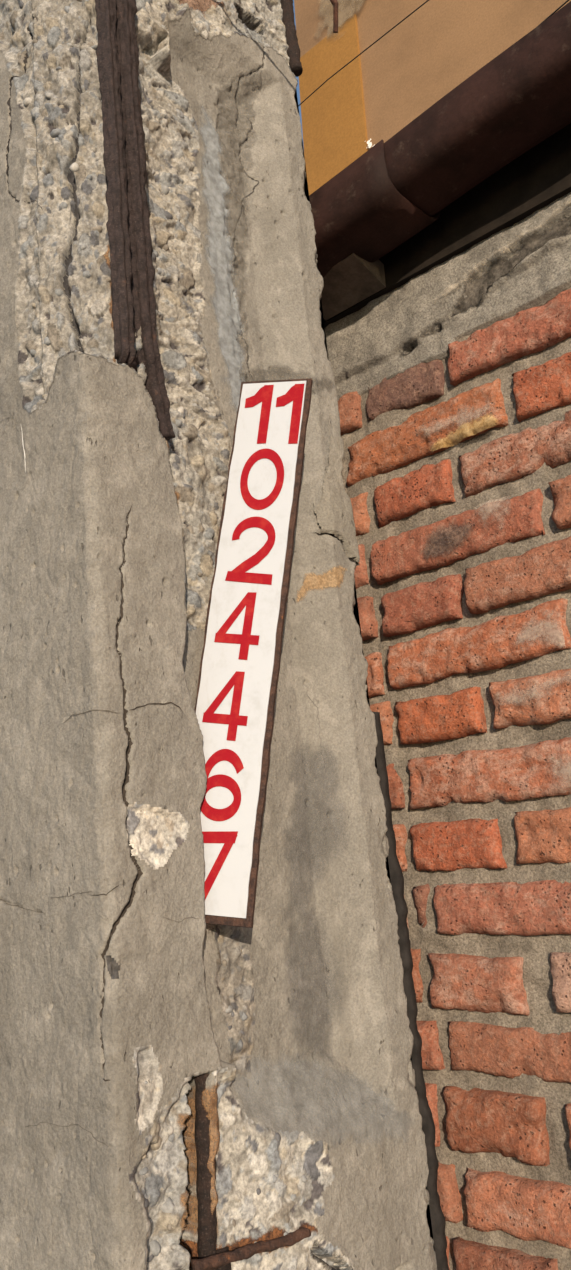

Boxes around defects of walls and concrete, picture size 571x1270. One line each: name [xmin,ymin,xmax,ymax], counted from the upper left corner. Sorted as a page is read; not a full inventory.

crack [6,26,43,211]
crack [63,19,91,353]
spalling [0,0,298,631]
crack [0,506,184,1081]
corrosion [178,1085,220,1270]
spalling [129,924,356,1270]
corrosion [216,1223,318,1254]